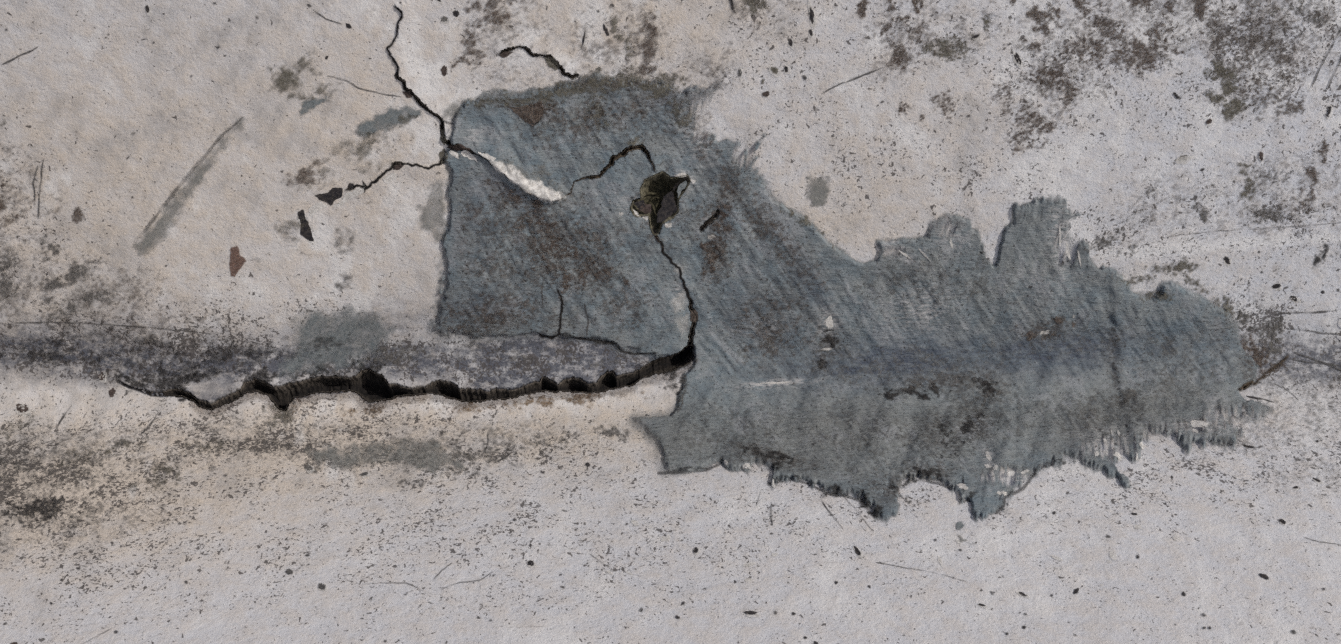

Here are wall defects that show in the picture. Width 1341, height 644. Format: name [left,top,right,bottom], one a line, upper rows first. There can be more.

crack [297,6,655,245]
crack [109,227,698,427]
water stain [450,179,646,361]
water stain [1085,228,1138,254]
water stain [1124,257,1283,366]
water stain [397,426,575,487]
water stain [721,411,792,469]
water stain [859,490,884,518]
water stain [735,300,1020,482]